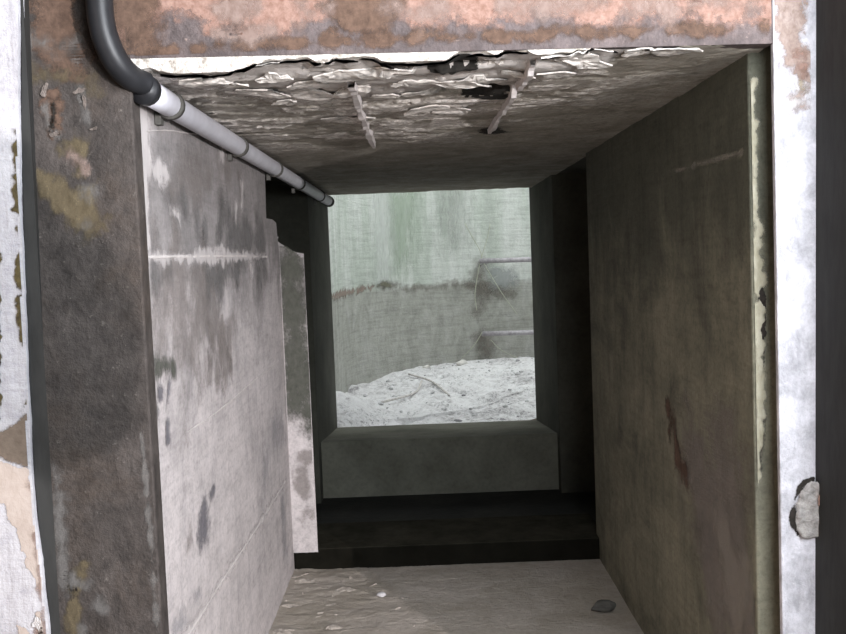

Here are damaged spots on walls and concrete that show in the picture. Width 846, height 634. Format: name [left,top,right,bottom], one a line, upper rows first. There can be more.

peeling [156,47,703,116]
rust [113,0,811,114]
water stain [140,105,266,383]
peeling [0,461,42,590]
spalling [789,477,820,539]